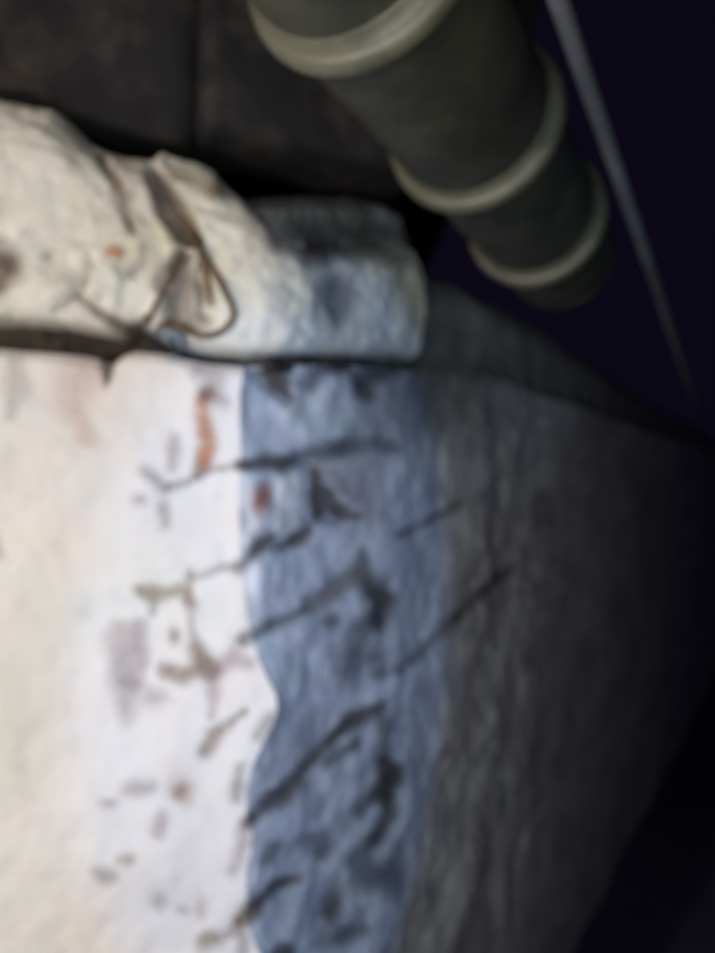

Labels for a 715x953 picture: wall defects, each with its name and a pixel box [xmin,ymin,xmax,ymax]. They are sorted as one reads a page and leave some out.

crack [100,155,135,232]
crack [0,281,395,386]
rust [196,395,214,477]
crack [237,439,397,471]
crack [217,527,312,571]
crack [396,503,460,537]
crack [138,588,190,602]
crack [394,566,511,673]
crack [243,703,390,827]
crack [236,876,299,925]